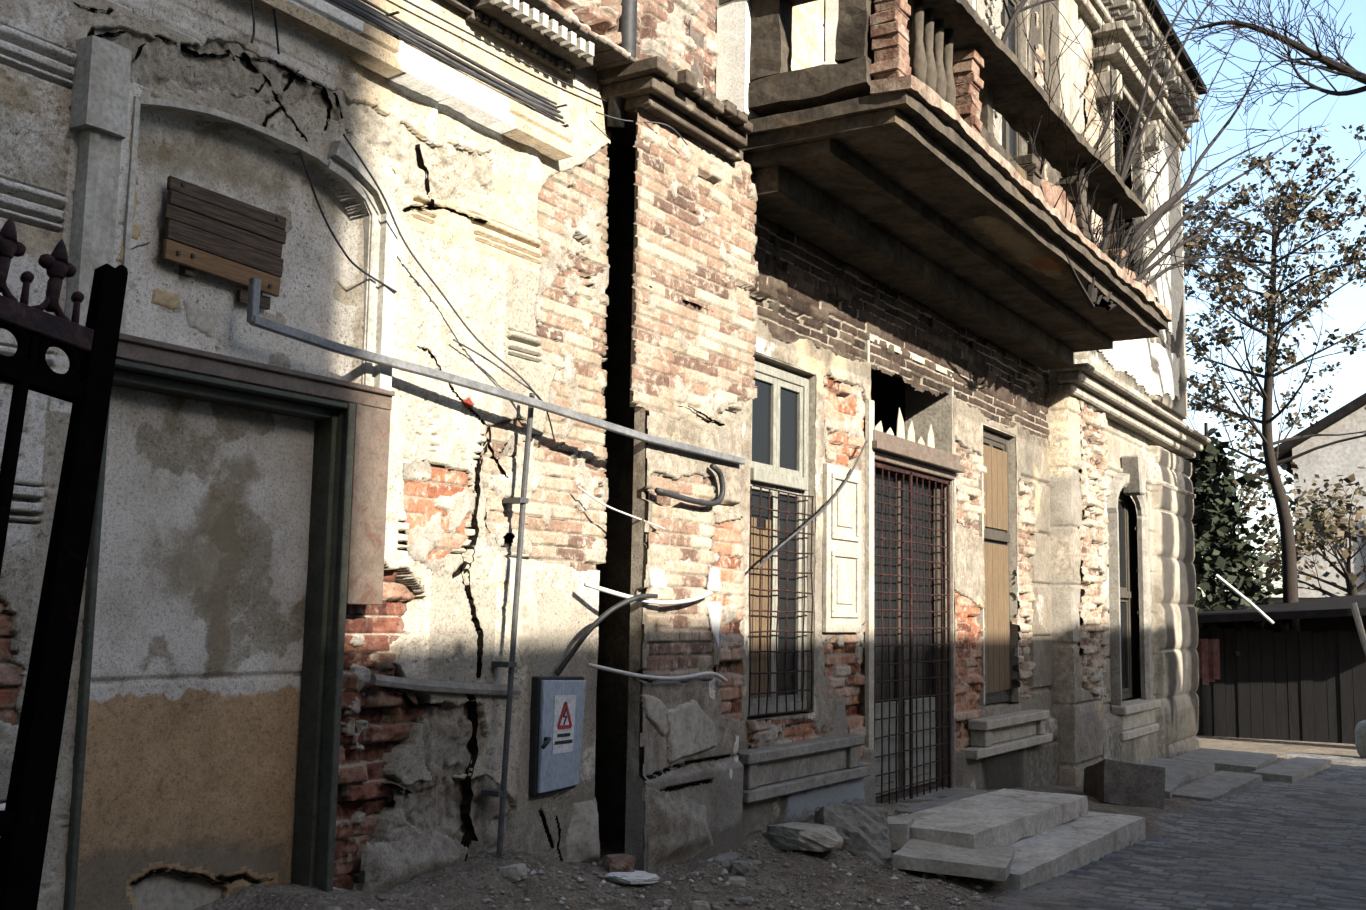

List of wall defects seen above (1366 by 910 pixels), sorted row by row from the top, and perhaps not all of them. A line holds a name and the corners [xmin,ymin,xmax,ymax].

crack [74,2,343,142]
flaking render [87,28,494,201]
peeling [283,0,364,35]
flaking render [546,0,719,94]
peeling [151,289,219,337]
flaking render [823,375,865,467]
flaking render [0,599,24,726]
leakage [171,460,256,668]
flaking render [333,144,610,890]
flaking render [641,472,867,764]
flaking render [953,592,986,752]
flaking render [1078,400,1111,699]